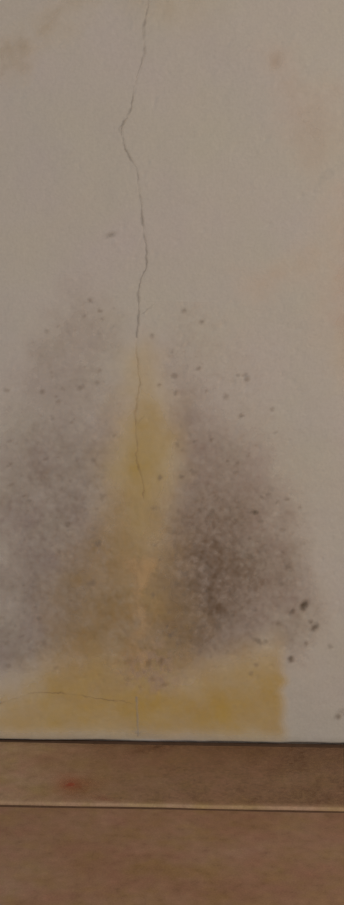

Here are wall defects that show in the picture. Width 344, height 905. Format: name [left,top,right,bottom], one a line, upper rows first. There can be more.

water stain [0,354,319,732]